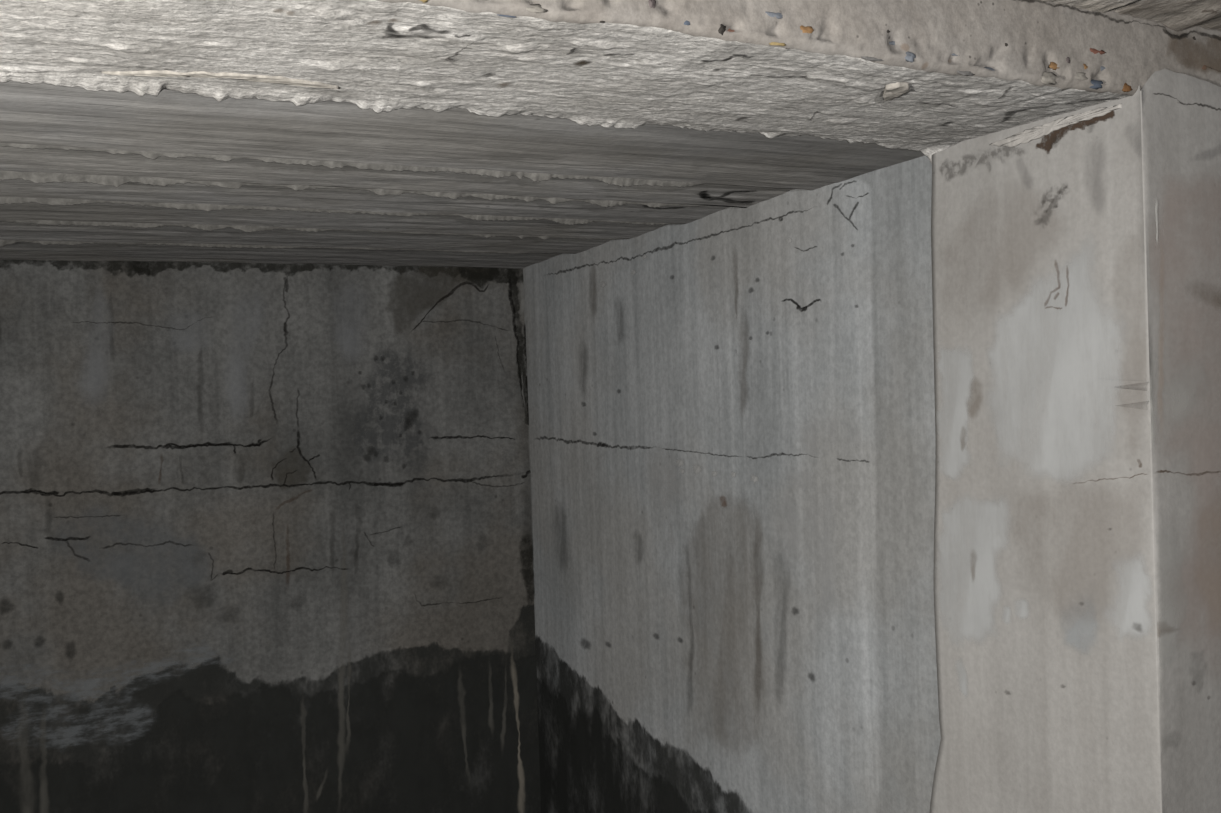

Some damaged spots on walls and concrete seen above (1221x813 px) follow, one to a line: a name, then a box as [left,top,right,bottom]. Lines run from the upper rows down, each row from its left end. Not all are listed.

crack [1022,0,1221,40]
crack [998,87,1118,122]
crack [1154,93,1220,110]
crack [432,433,512,441]
crack [0,432,496,497]
crack [3,537,85,548]
crack [223,566,345,575]
damp [0,538,746,813]